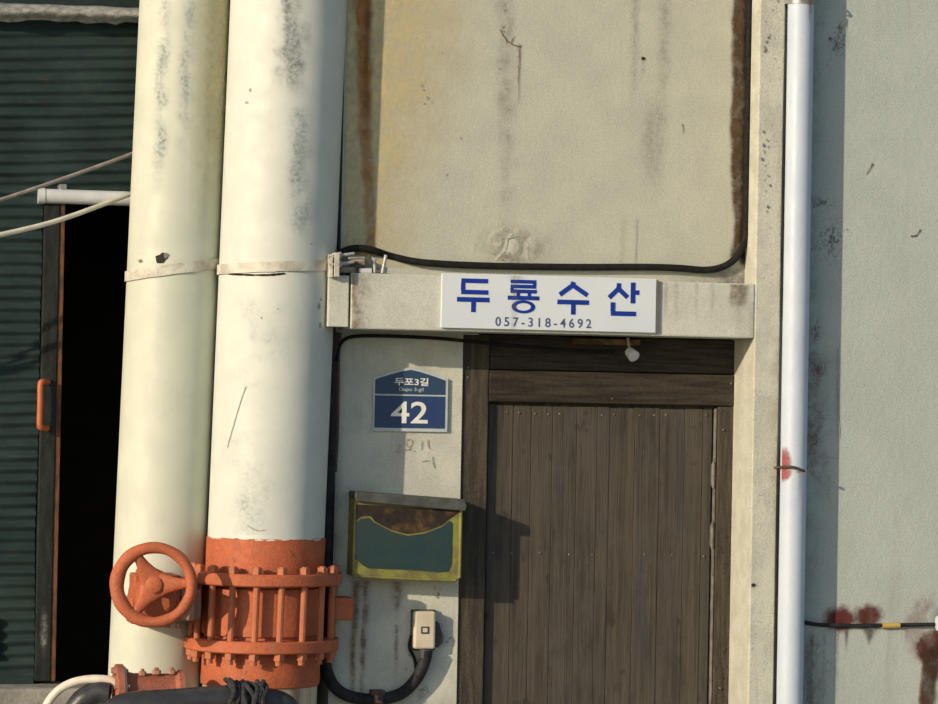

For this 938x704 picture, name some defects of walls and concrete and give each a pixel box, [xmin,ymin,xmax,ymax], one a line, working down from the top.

crack [500,29,522,98]
corrosion [343,0,426,267]
damp [723,0,746,302]
corrosion [781,451,799,479]
corrosion [351,584,367,676]
corrosion [827,607,879,638]
corrosion [916,631,938,704]